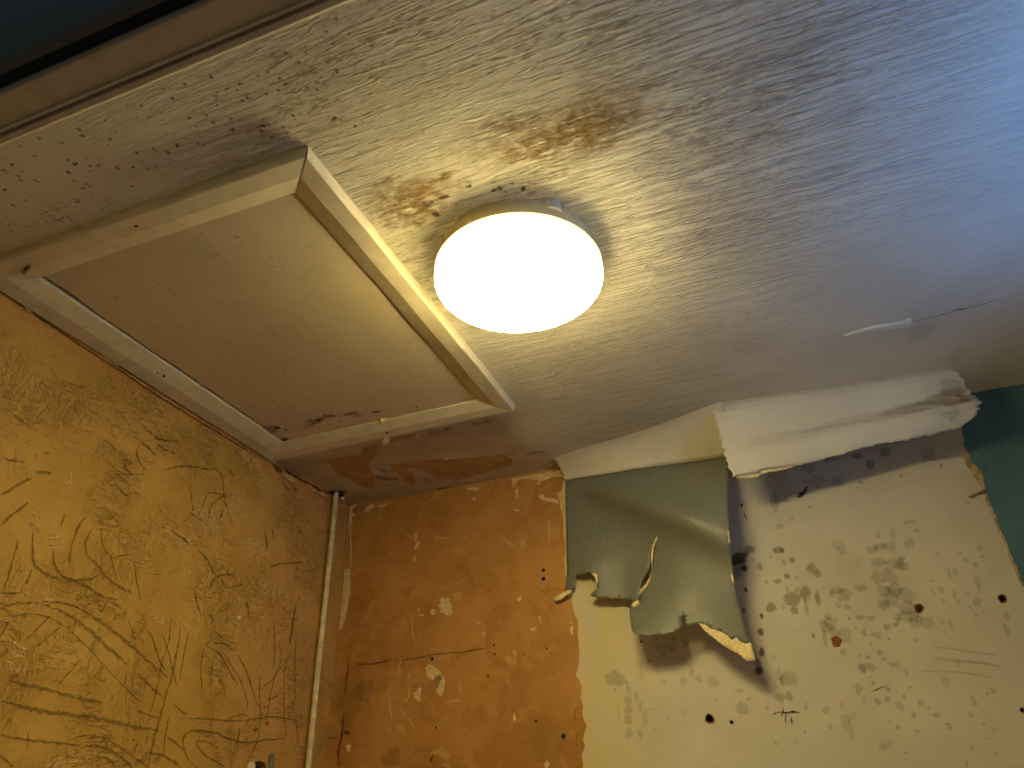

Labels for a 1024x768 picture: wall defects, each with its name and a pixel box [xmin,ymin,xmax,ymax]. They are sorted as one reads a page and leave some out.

peeling [323,431,416,489]
peeling [389,455,563,511]
water stain [731,552,748,571]
flaking render [418,597,453,616]
crack [328,614,490,766]
flaking render [413,657,445,702]